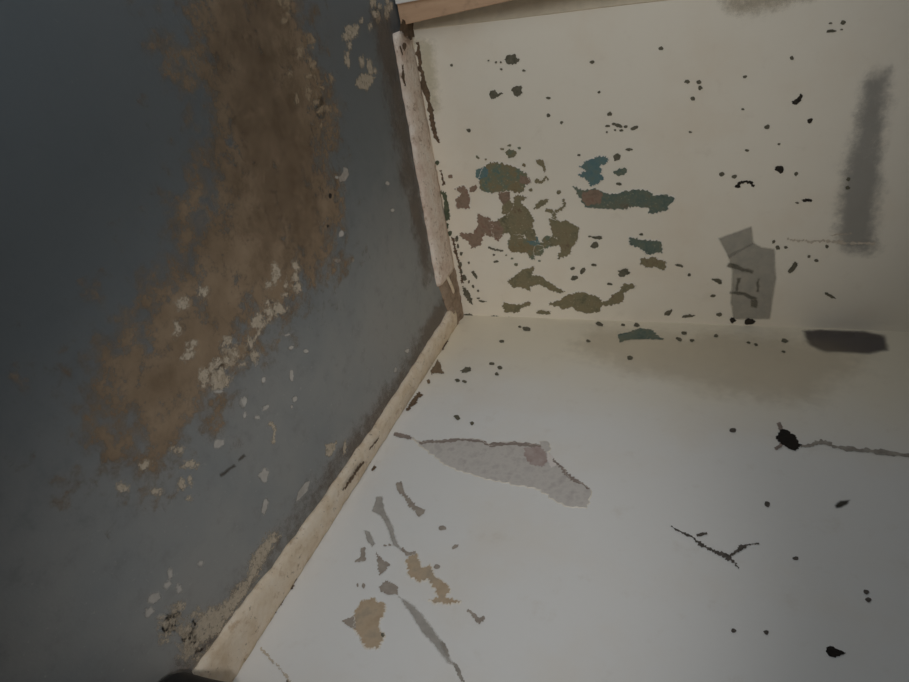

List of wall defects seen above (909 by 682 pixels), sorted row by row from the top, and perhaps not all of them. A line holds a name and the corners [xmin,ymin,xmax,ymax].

peeling [572,148,676,215]
damp [84,0,352,476]
peeling [439,144,637,326]
peeling [628,233,691,276]
peeling [198,260,303,394]
flaking render [394,432,592,508]
crack [800,439,909,457]
flaking render [342,544,398,650]
flaking render [401,547,485,624]
crack [671,526,759,569]
crack [260,647,291,682]
crack [440,641,465,682]